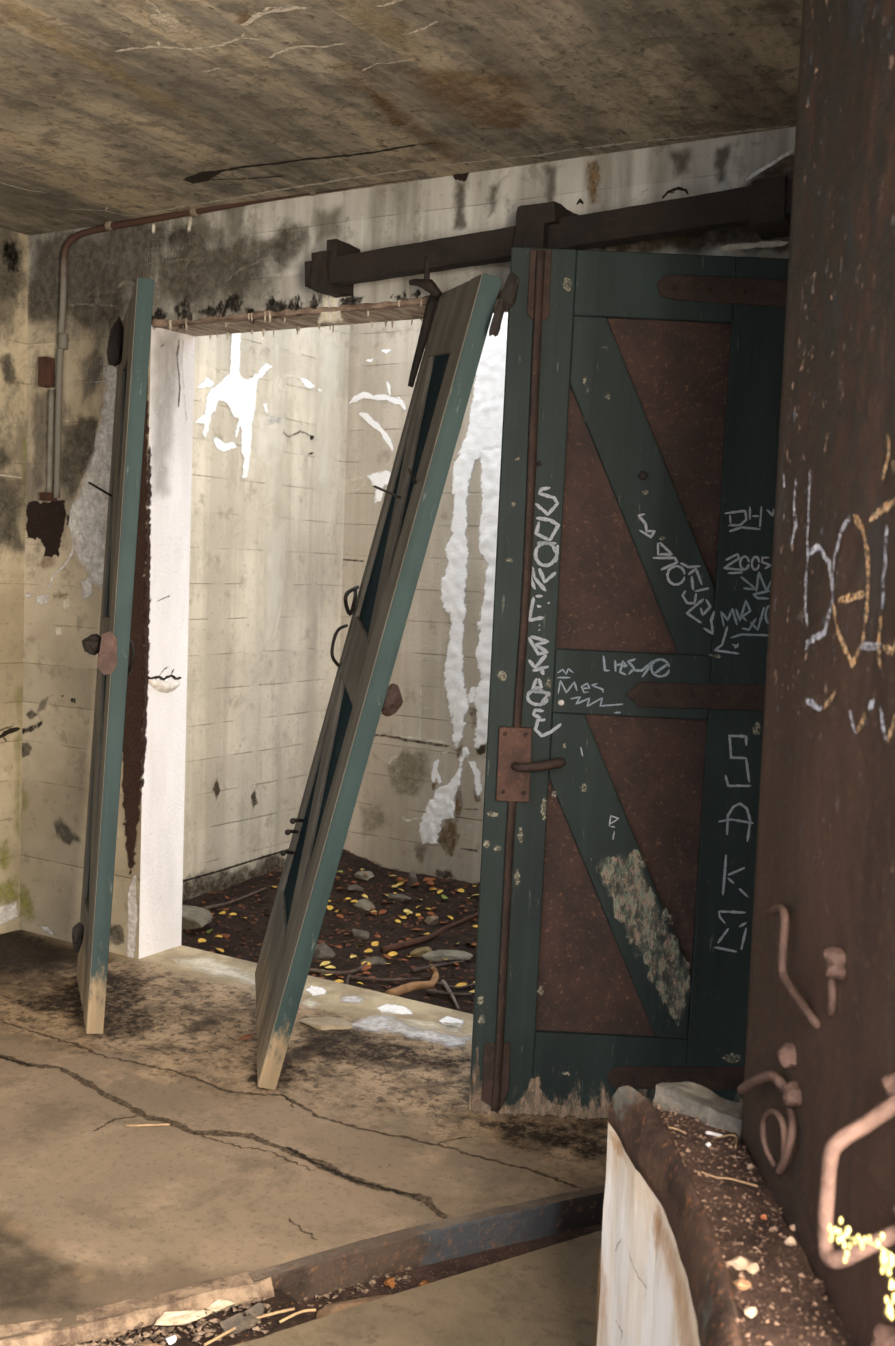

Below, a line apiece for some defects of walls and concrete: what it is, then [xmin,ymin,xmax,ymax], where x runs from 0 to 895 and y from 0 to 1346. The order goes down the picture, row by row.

damp [0,126,794,496]
damp [0,394,48,550]
damp [48,418,97,588]
damp [349,470,391,503]
damp [402,312,508,886]
crack [0,1022,576,1218]
crack [289,1218,317,1240]